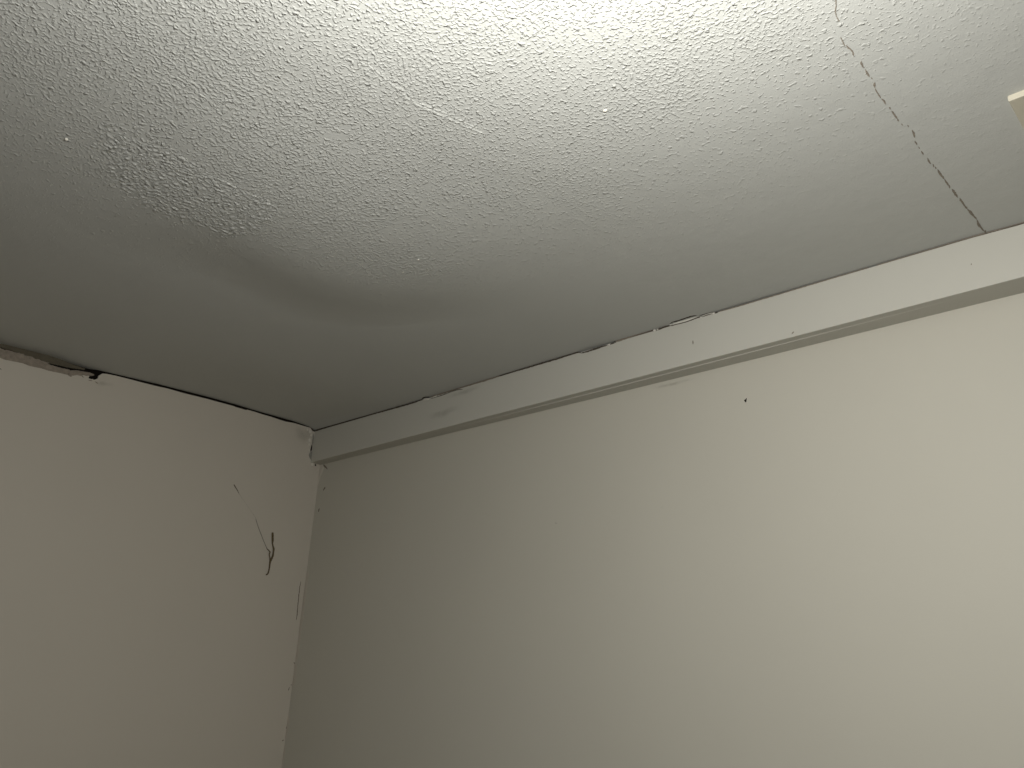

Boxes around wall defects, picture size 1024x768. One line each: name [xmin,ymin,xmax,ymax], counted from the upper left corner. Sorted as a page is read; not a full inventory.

crack [48,363,83,371]
crack [307,0,1024,469]